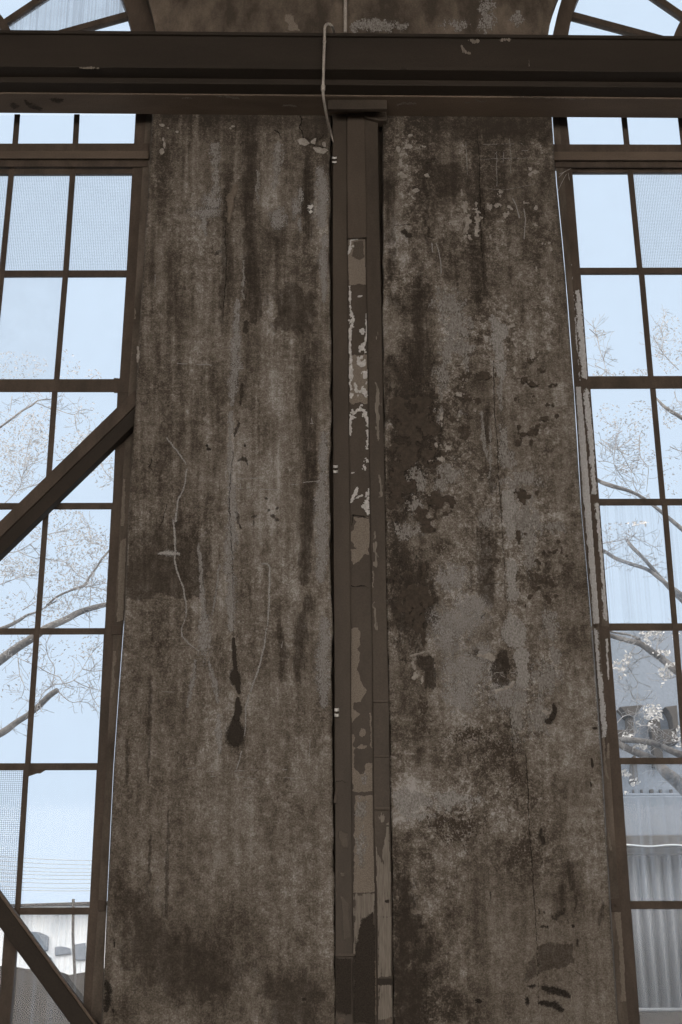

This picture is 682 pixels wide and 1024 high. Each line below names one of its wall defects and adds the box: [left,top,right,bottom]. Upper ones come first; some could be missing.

water stain [186,260,245,754]
peeling [348,239,380,474]
water stain [385,287,570,578]
water stain [388,556,564,751]
peeling [336,628,392,1020]
water stain [393,787,485,824]
water stain [394,868,431,1024]